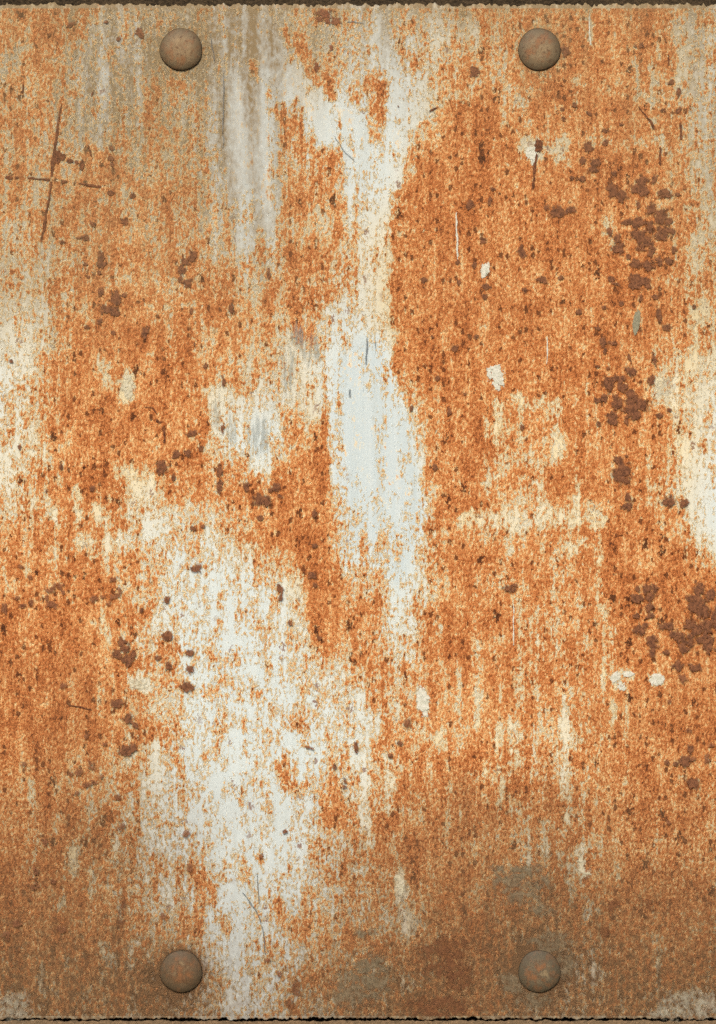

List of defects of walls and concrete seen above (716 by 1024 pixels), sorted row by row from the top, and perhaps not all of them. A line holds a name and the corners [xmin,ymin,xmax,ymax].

rust [0,8,557,1016]
rust [253,8,716,1016]